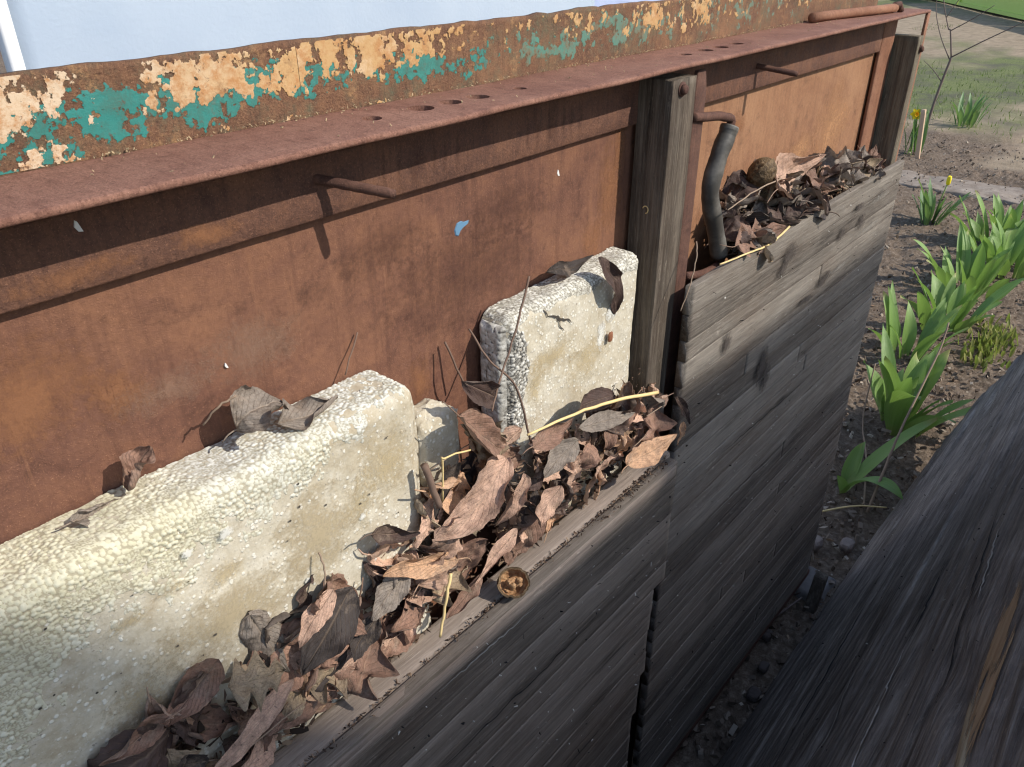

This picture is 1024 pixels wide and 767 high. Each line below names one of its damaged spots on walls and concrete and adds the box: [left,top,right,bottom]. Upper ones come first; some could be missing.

peeling [0,0,811,175]